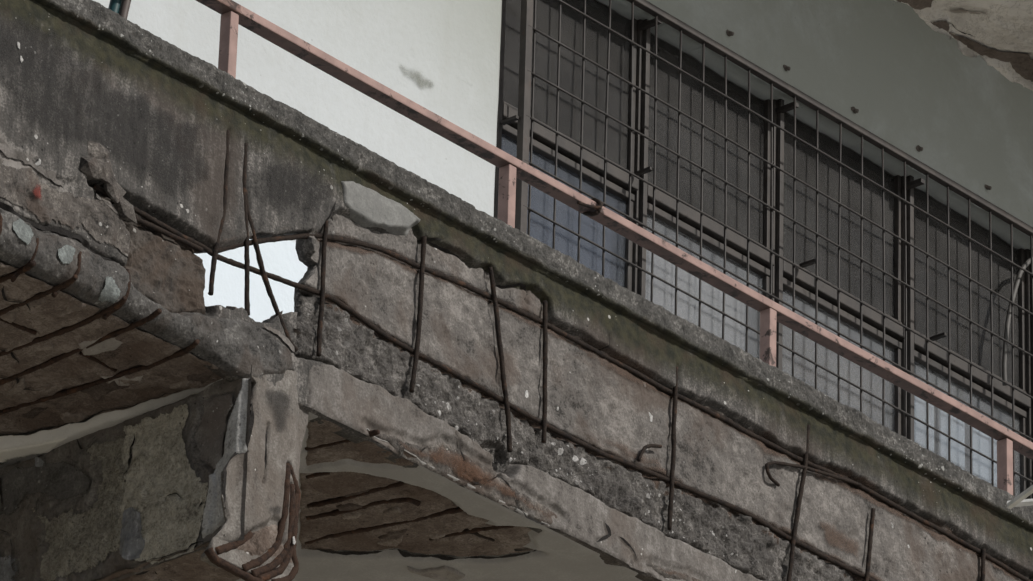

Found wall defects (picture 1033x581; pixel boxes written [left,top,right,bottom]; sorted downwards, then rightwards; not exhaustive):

peeling [897,0,933,10]
peeling [931,21,1033,82]
spalling [0,130,1033,581]